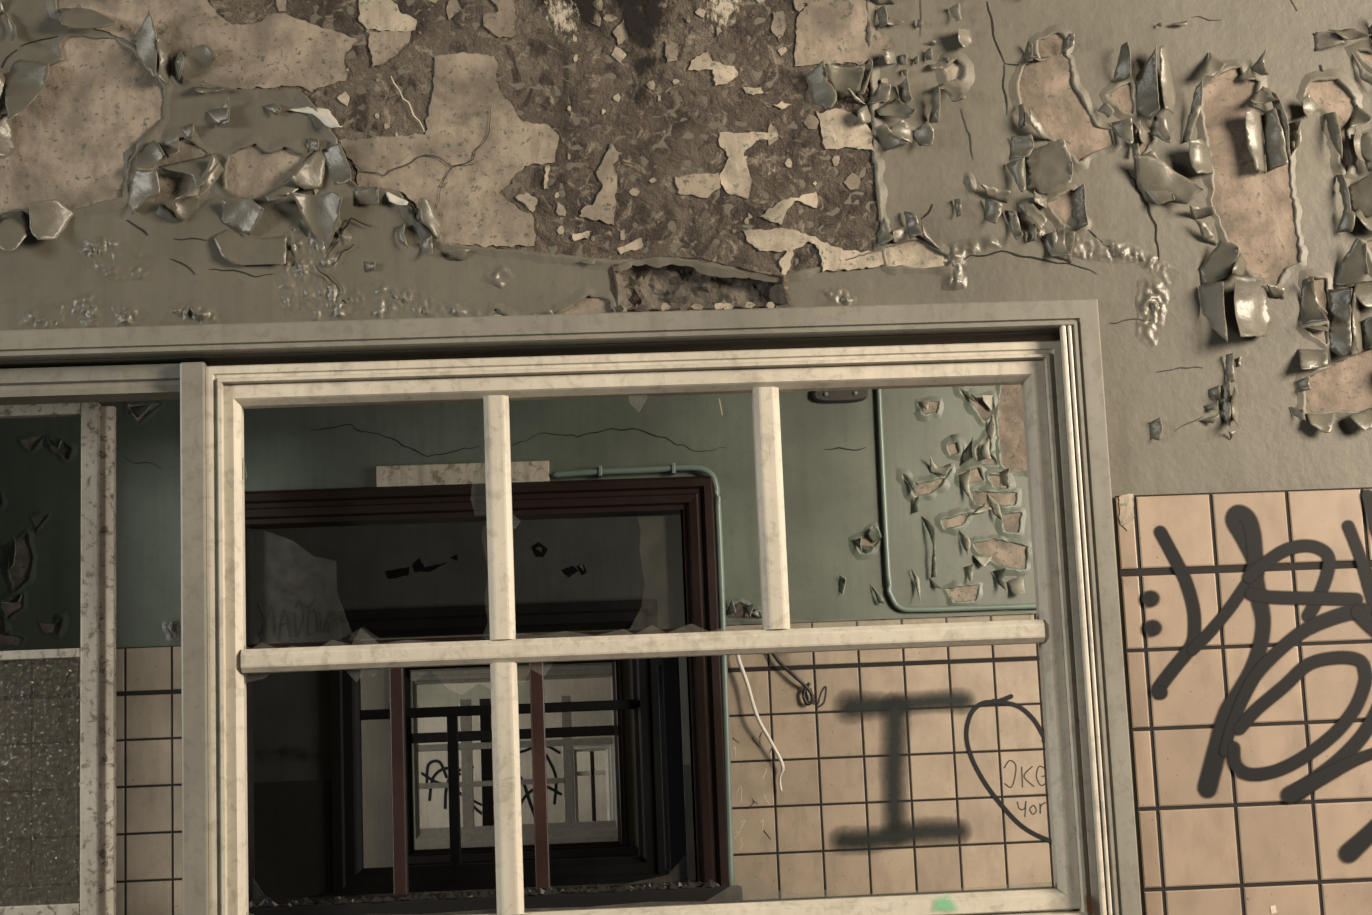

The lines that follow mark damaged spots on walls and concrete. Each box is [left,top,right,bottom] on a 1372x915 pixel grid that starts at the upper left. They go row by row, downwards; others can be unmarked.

crack [1,36,58,68]
flaking render [0,0,975,316]
peeling [978,24,1372,441]
peeling [0,509,70,651]
peeling [15,431,79,464]
peeling [896,385,1033,606]